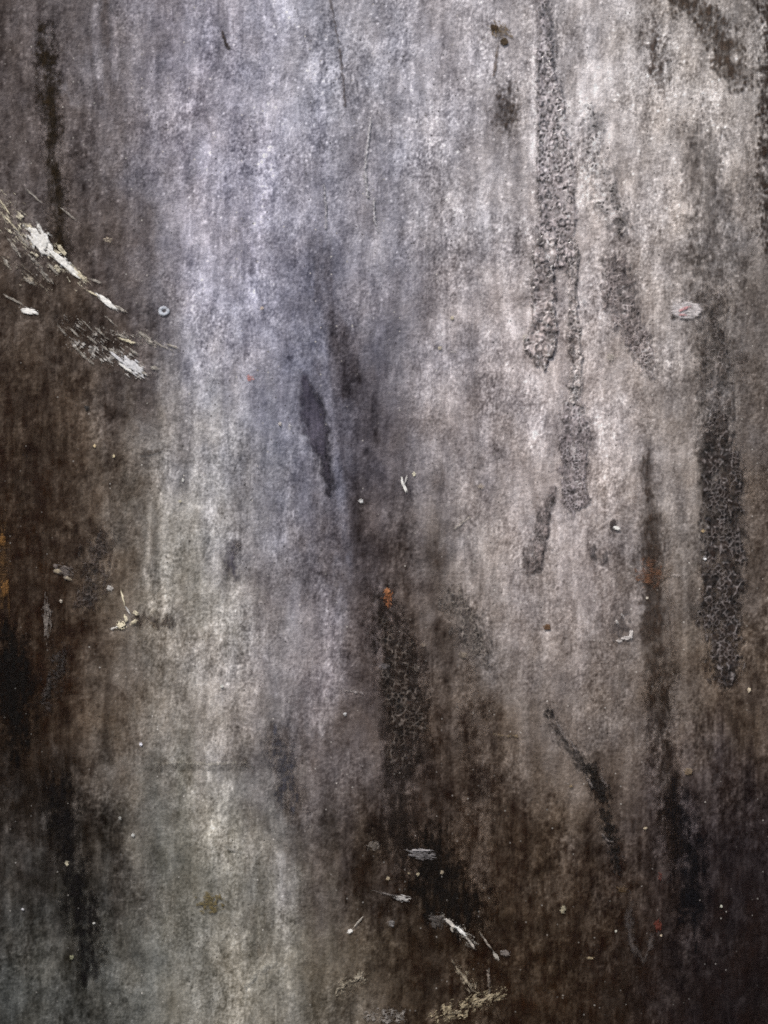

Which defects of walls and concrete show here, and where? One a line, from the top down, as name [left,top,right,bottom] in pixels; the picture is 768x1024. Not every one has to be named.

peeling [0,200,35,268]
damp [36,24,64,255]
peeling [26,245,100,297]
peeling [62,323,178,375]
damp [373,595,482,939]
damp [47,773,98,983]